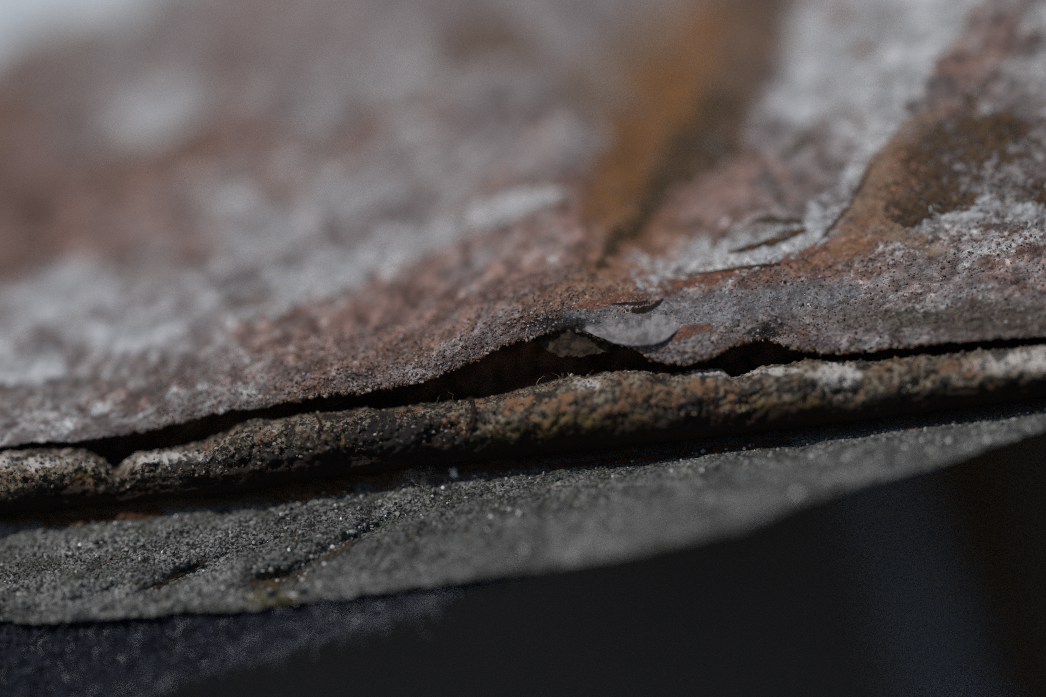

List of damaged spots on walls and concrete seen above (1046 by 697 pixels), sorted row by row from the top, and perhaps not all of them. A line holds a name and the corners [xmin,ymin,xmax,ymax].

rust [574,109,950,311]
peeling [581,312,682,346]
rust [546,439,792,469]
rust [276,486,354,503]
rust [39,510,163,528]